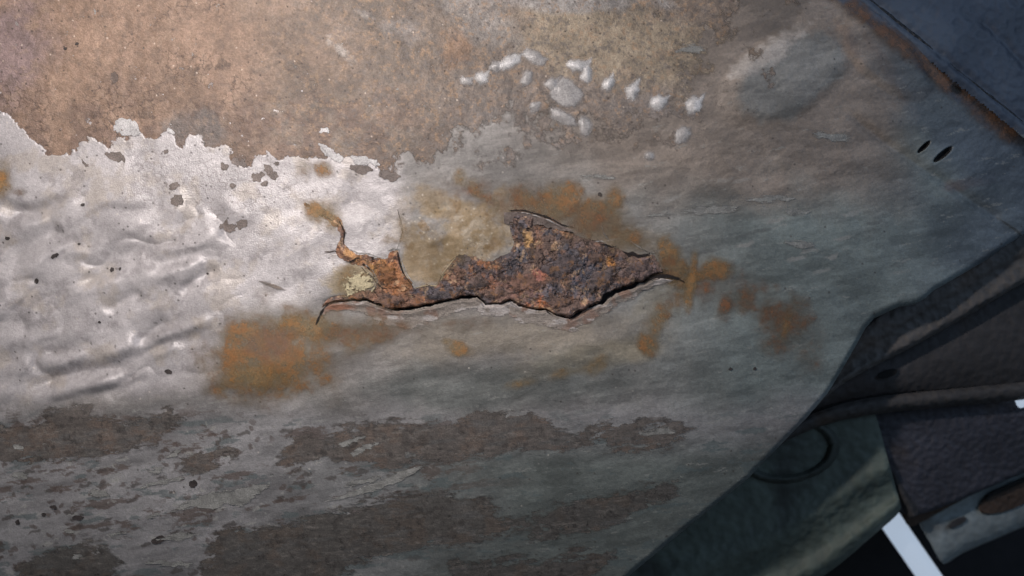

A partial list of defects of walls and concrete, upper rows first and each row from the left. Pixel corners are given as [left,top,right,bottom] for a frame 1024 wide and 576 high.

peeling [169,182,183,206]
peeling [219,219,248,233]
crack [304,203,685,332]
rust [638,237,729,356]
rust [212,307,384,397]